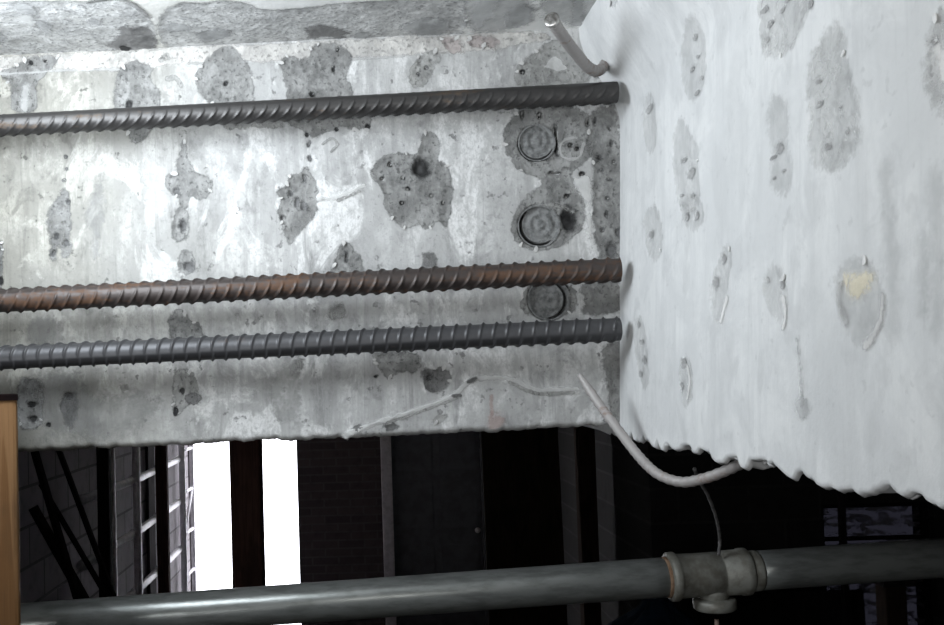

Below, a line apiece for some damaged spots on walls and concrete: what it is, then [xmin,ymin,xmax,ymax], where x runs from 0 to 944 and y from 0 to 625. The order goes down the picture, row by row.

water stain [505,4,533,28]
spalling [760,0,789,42]
spalling [0,0,743,488]